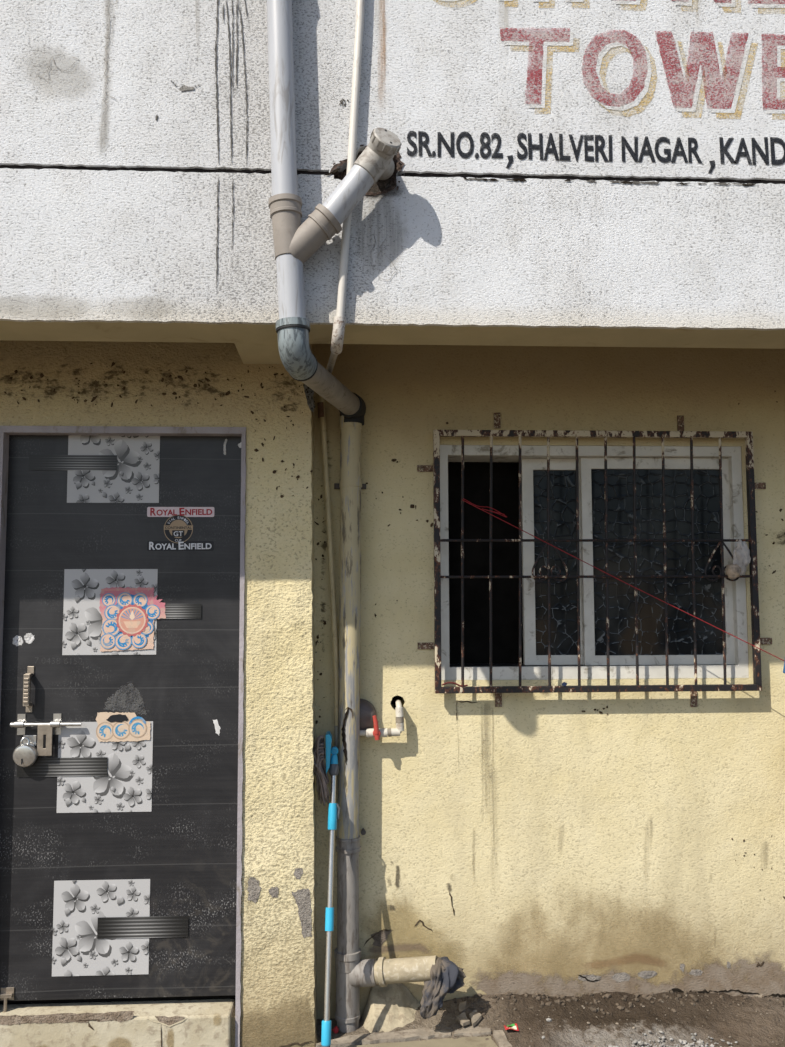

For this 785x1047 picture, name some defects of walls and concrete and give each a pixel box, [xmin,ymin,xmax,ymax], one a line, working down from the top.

water stain [215,0,248,163]
water stain [0,362,148,407]
water stain [161,366,300,429]
spalling [247,877,278,903]
spalling [292,868,312,938]